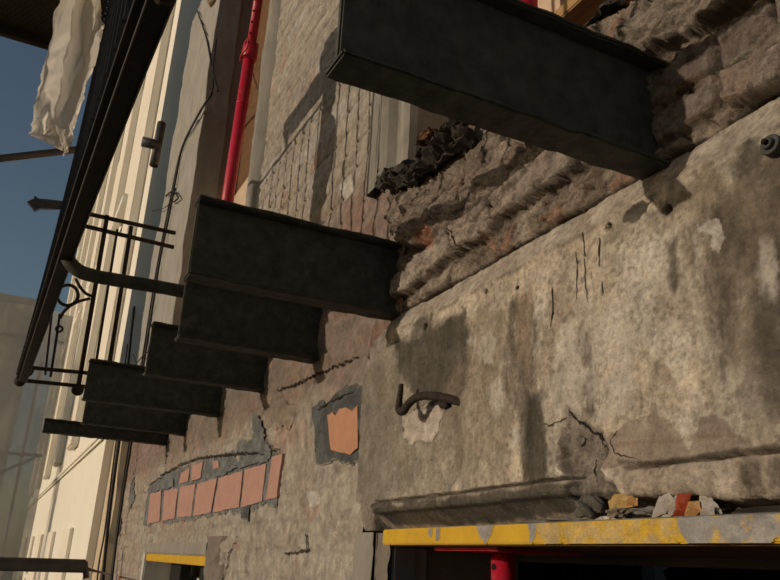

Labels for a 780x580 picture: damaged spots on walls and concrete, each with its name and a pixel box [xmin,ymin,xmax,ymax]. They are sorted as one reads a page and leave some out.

spalling [587,0,780,161]
spalling [384,125,639,313]
crack [575,232,603,301]
peeling [695,217,727,254]
water stain [159,285,580,529]
spalling [402,402,443,446]
peeling [468,330,508,422]
crack [610,432,639,460]
peeling [523,265,754,516]